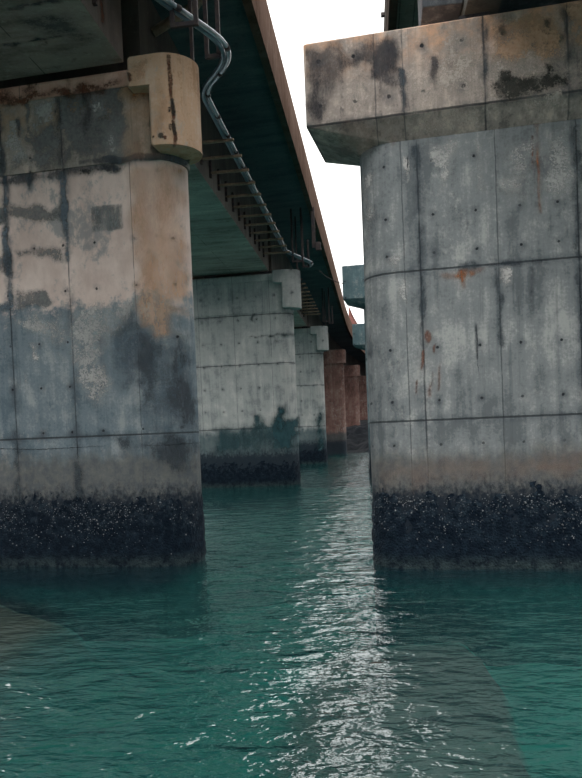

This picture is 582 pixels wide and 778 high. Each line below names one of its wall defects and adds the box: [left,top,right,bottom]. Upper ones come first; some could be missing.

corrosion [0,79,118,106]
damp [305,46,342,118]
damp [356,40,475,112]
damp [483,11,568,107]
damp [0,87,190,311]
damp [18,299,196,425]
damp [216,406,301,452]